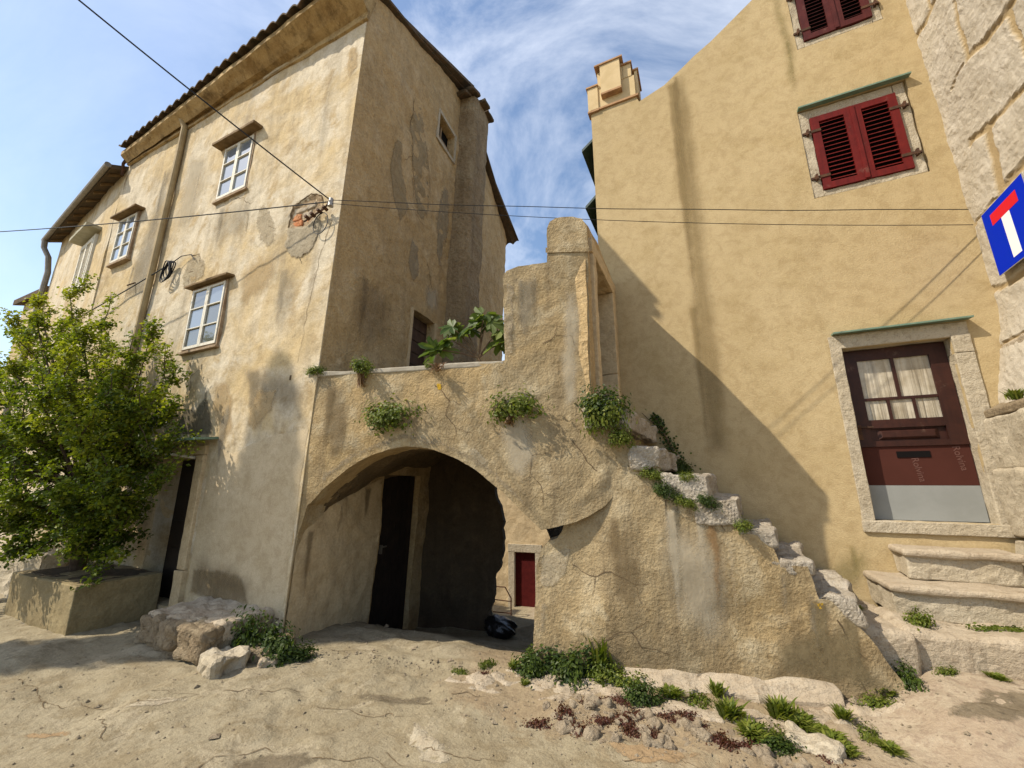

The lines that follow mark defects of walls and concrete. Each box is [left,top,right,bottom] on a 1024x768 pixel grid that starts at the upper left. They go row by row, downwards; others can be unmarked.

flaking render [245,193,324,258]
crack [572,564,670,655]